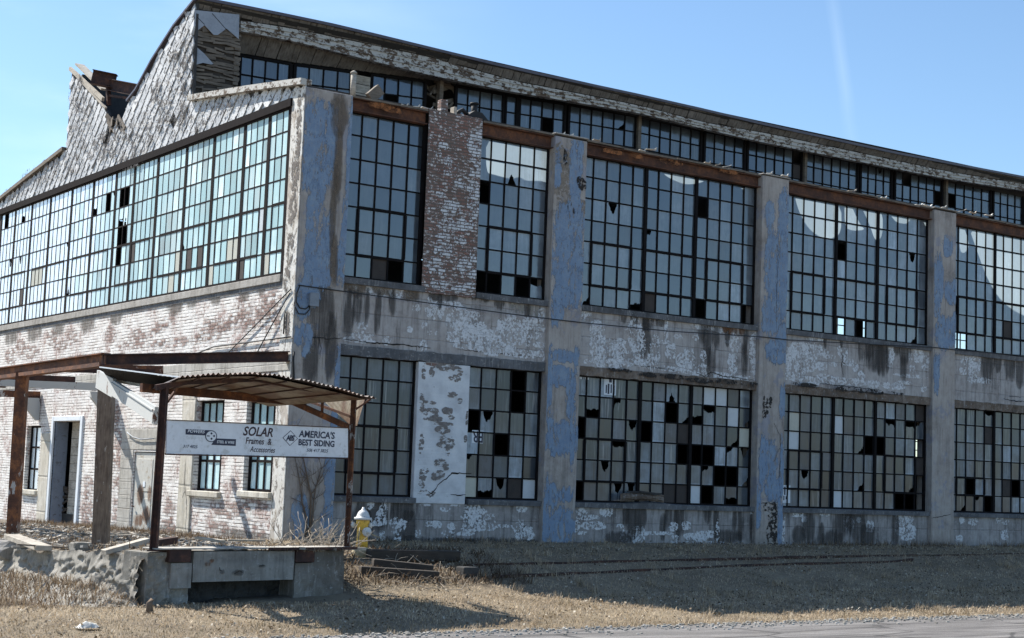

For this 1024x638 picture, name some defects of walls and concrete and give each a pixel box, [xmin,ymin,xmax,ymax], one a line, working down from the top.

damp [303,94,458,381]
peeling [105,95,991,545]
damp [622,316,664,354]
damp [700,325,730,377]
damp [858,344,911,377]
crack [428,472,471,496]